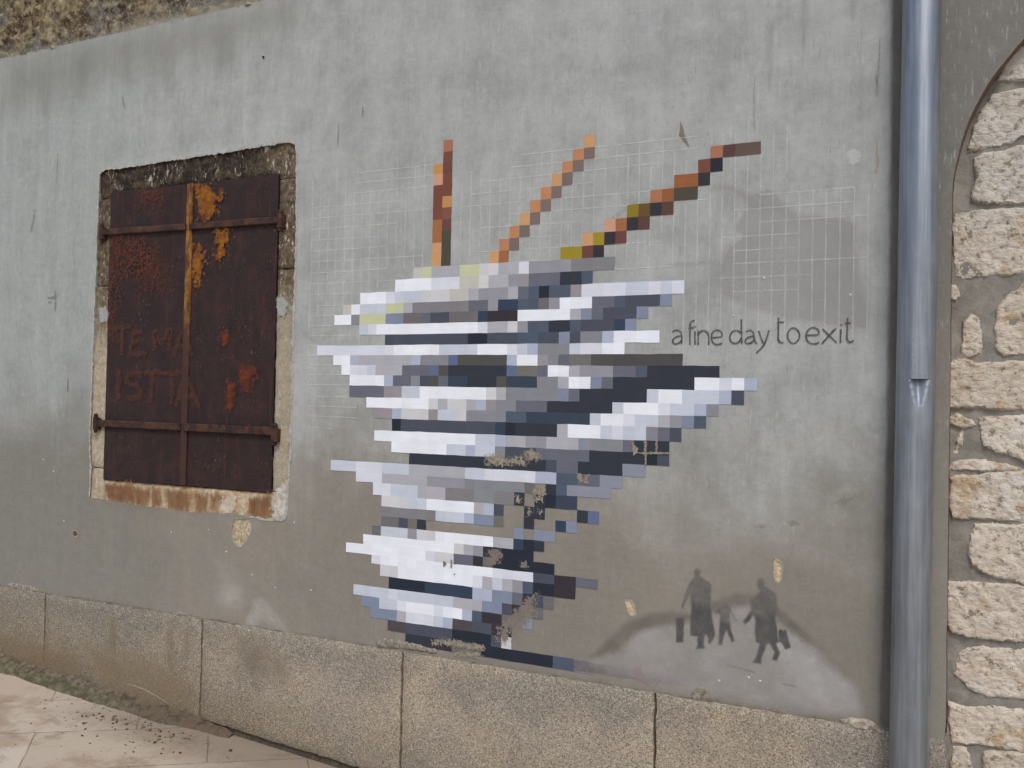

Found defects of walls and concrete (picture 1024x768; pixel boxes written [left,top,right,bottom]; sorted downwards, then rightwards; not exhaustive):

corrosion [191,183,229,288]
peeling [483,447,542,467]
peeling [632,440,669,465]
corrosion [105,482,225,512]
corrosion [247,493,273,518]
peeling [514,486,547,517]
spalling [232,518,252,547]
spalling [773,558,783,583]
peeling [492,592,543,646]
spalling [625,599,637,616]